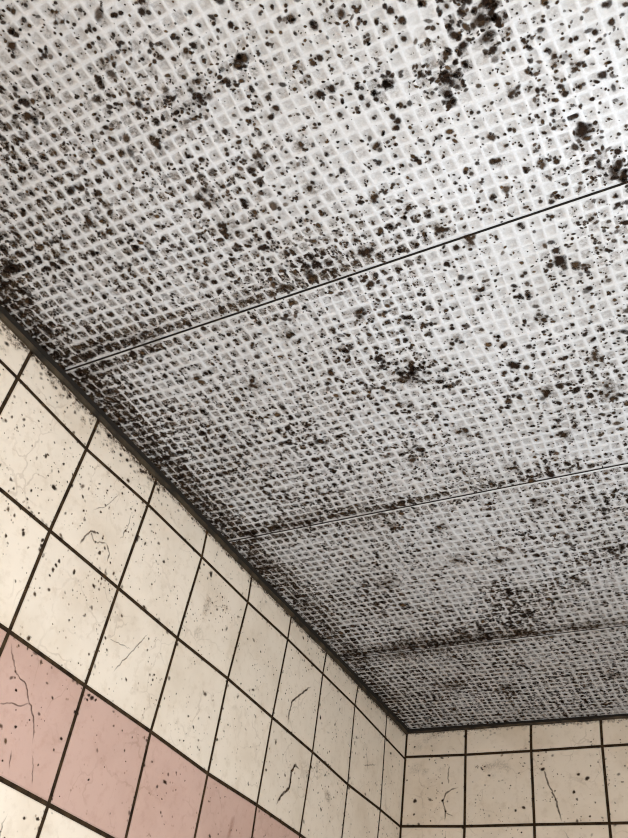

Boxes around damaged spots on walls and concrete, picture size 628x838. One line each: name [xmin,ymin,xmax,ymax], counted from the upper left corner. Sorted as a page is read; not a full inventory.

damp [0,324,171,538]
crack [278,764,298,801]